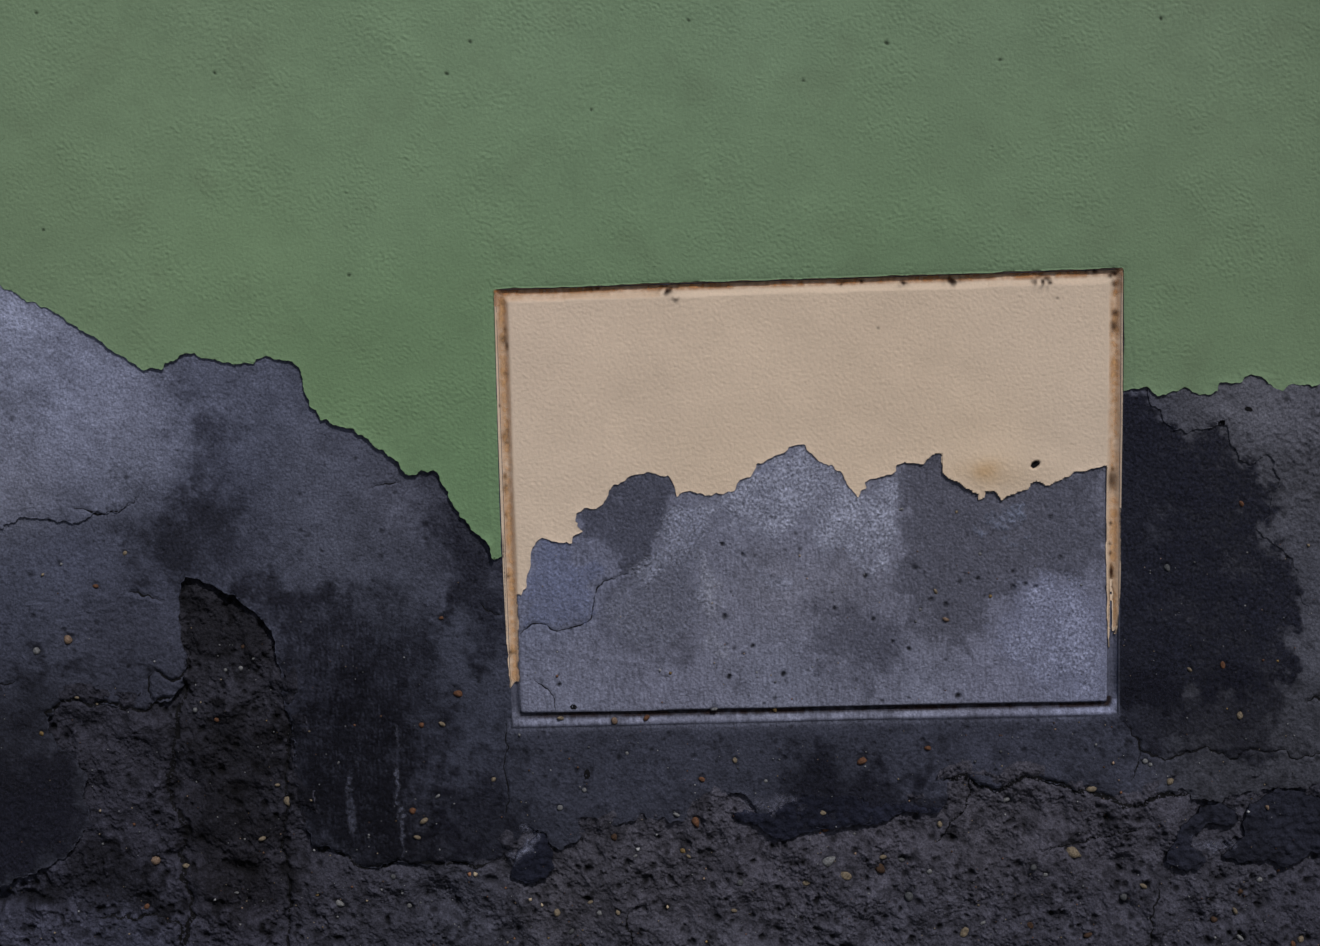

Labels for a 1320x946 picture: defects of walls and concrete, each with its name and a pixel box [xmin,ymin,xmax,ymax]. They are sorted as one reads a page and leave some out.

water stain [0,708,184,934]
crack [44,657,196,946]
water stain [231,575,533,867]
crack [280,716,491,946]
peeling [0,267,1320,946]
water stain [1000,576,1103,700]
water stain [1112,393,1303,763]